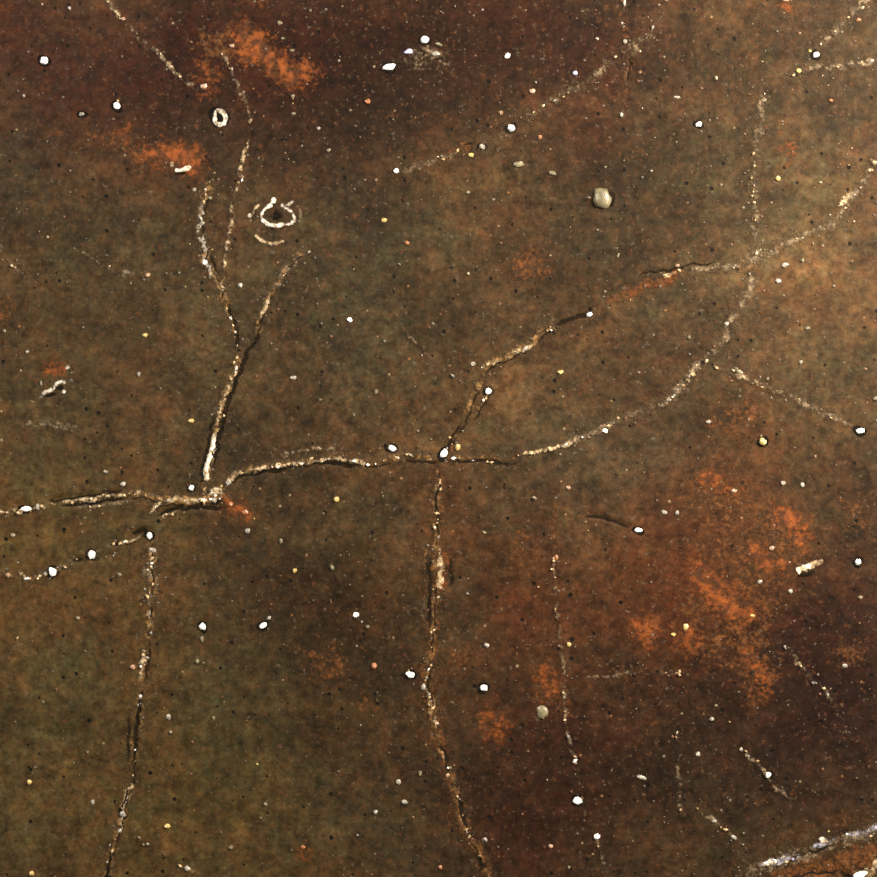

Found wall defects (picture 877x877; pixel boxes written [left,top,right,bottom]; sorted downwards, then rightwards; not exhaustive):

rust [188,15,319,101]
crack [526,0,654,119]
crack [221,53,254,191]
crack [406,137,491,171]
crack [0,180,492,877]
crack [551,503,628,764]
rust [630,614,675,649]
rust [675,464,814,710]
crack [745,750,785,795]
crack [678,804,877,877]